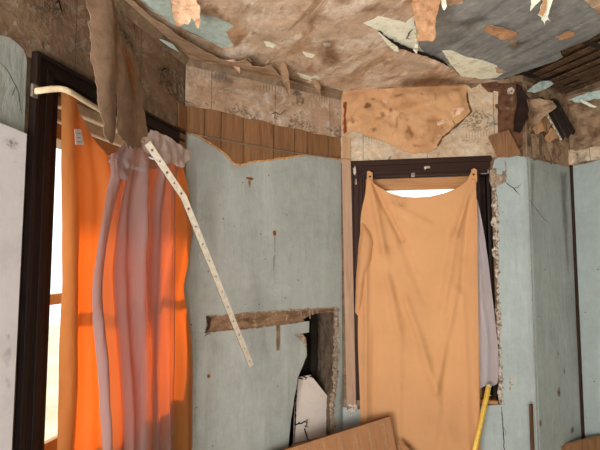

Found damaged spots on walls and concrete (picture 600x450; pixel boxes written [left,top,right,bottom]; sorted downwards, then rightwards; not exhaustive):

peeling [140,0,234,48]
peeling [364,16,424,53]
peeling [442,50,515,94]
flaking render [491,188,513,405]
spalling [295,314,318,382]
spalling [329,308,340,434]
spalling [288,392,296,447]